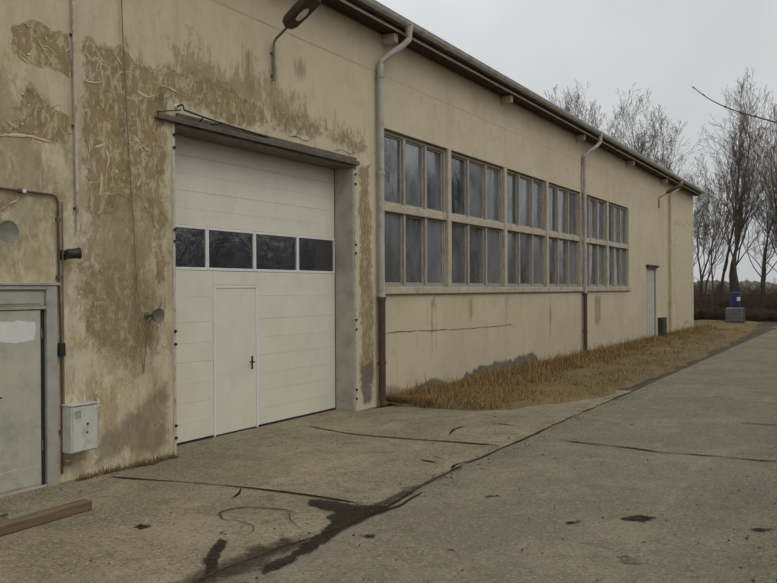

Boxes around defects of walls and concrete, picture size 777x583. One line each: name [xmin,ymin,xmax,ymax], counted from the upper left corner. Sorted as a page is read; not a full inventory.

flaking render [0,20,374,382]
leakage [361,363,372,403]
crack [110,476,364,527]